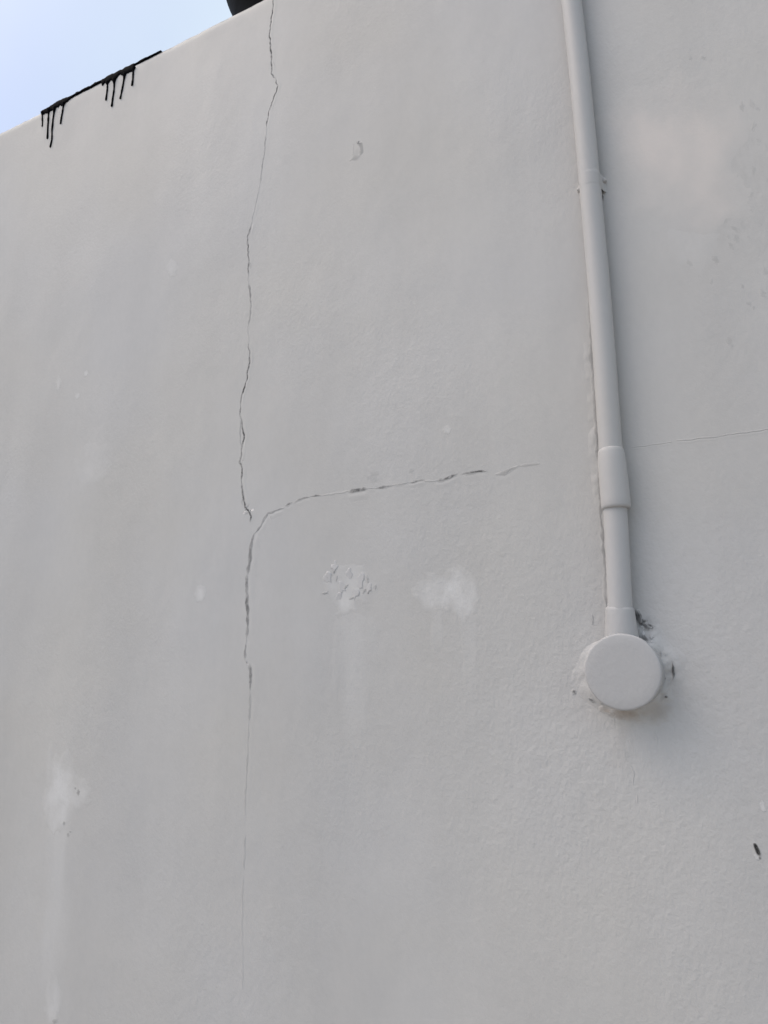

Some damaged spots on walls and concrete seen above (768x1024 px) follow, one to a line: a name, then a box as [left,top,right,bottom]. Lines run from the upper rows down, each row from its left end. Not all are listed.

crack [239,0,539,989]